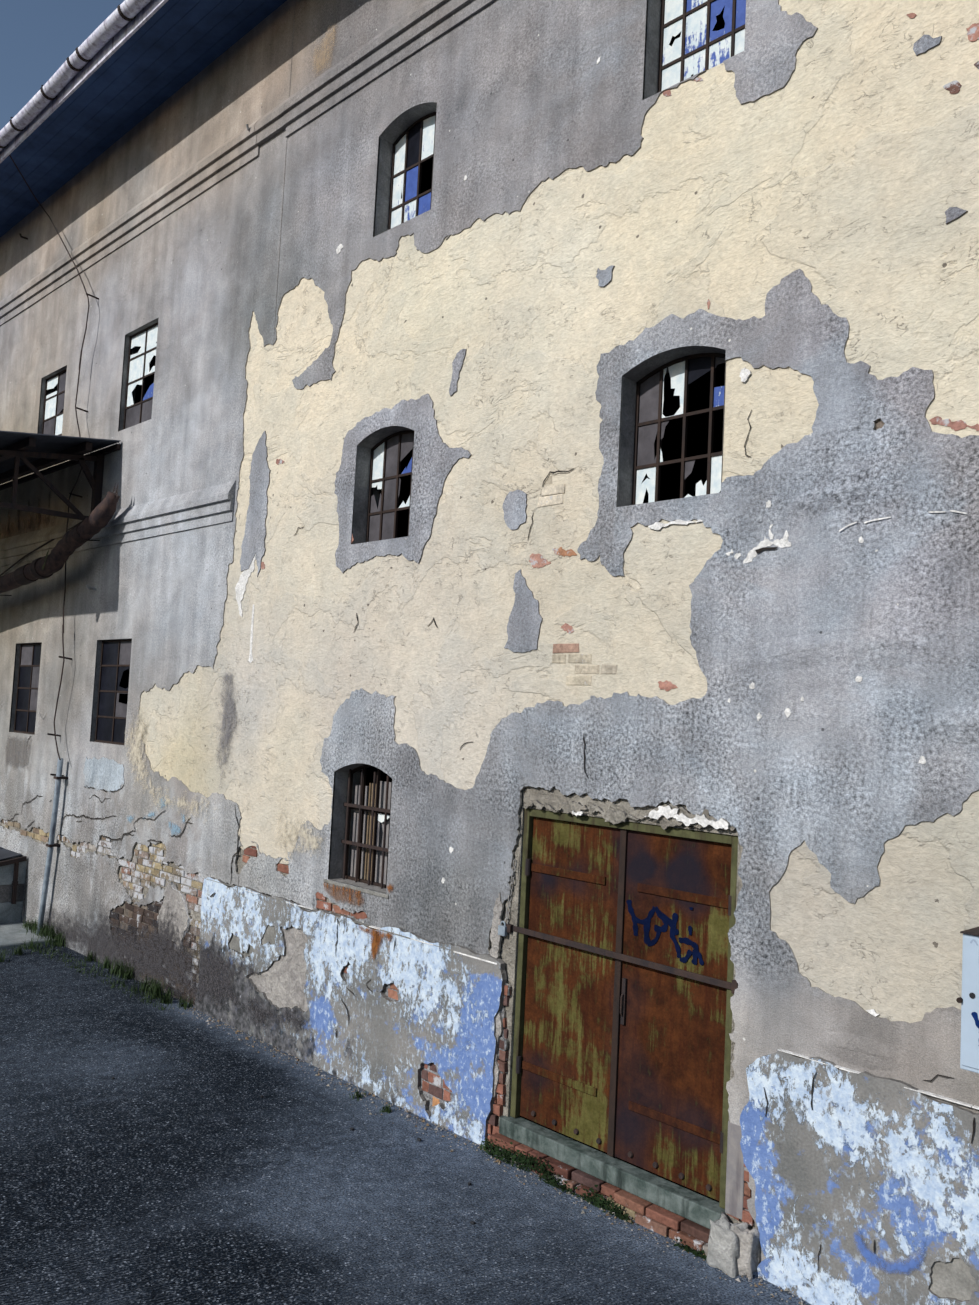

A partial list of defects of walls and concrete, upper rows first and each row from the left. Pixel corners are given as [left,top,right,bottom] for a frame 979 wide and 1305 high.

flaking render [83,0,979,876]
crack [7,785,192,842]
flaking render [0,820,204,1005]
flaking render [229,925,308,1012]
flaking render [388,983,398,1000]
flaking render [487,786,743,1146]
flaking render [770,790,979,1023]
flaking render [421,1063,452,1106]
flaking render [725,1117,758,1230]
flaking render [930,1258,978,1301]